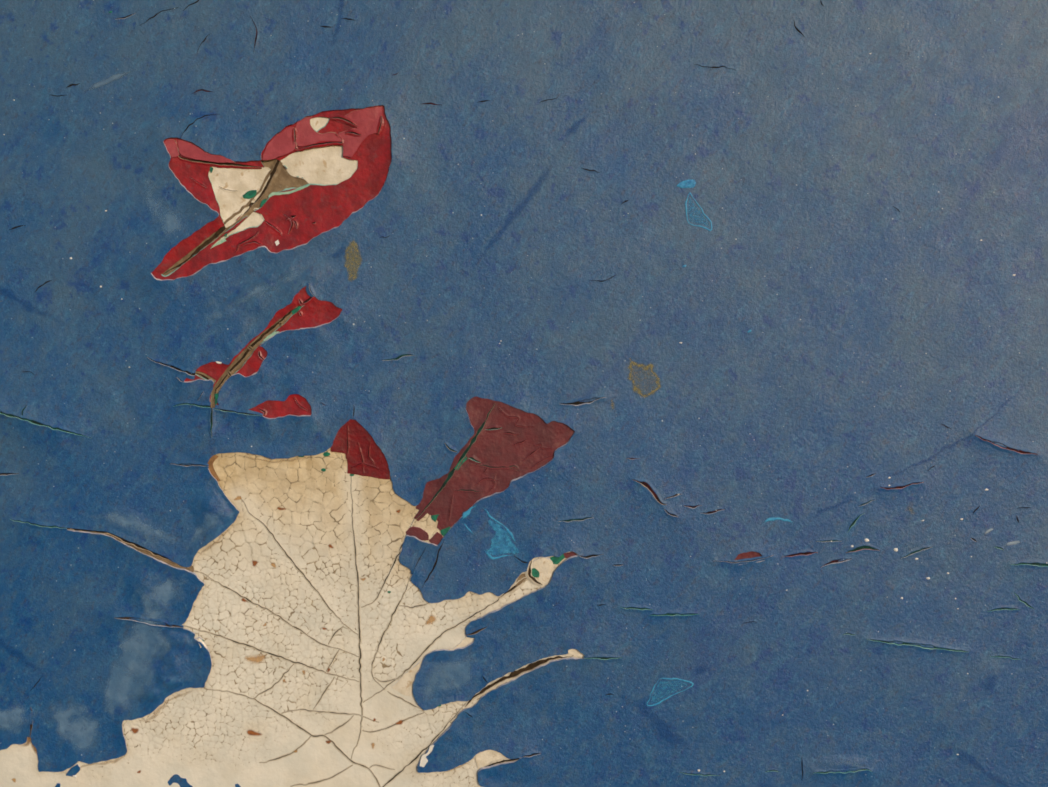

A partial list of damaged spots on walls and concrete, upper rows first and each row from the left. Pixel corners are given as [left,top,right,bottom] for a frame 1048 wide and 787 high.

peeling [151,105,392,280]
peeling [146,280,342,438]
peeling [0,397,578,787]
crack [10,425,624,787]
peeling [563,649,585,658]